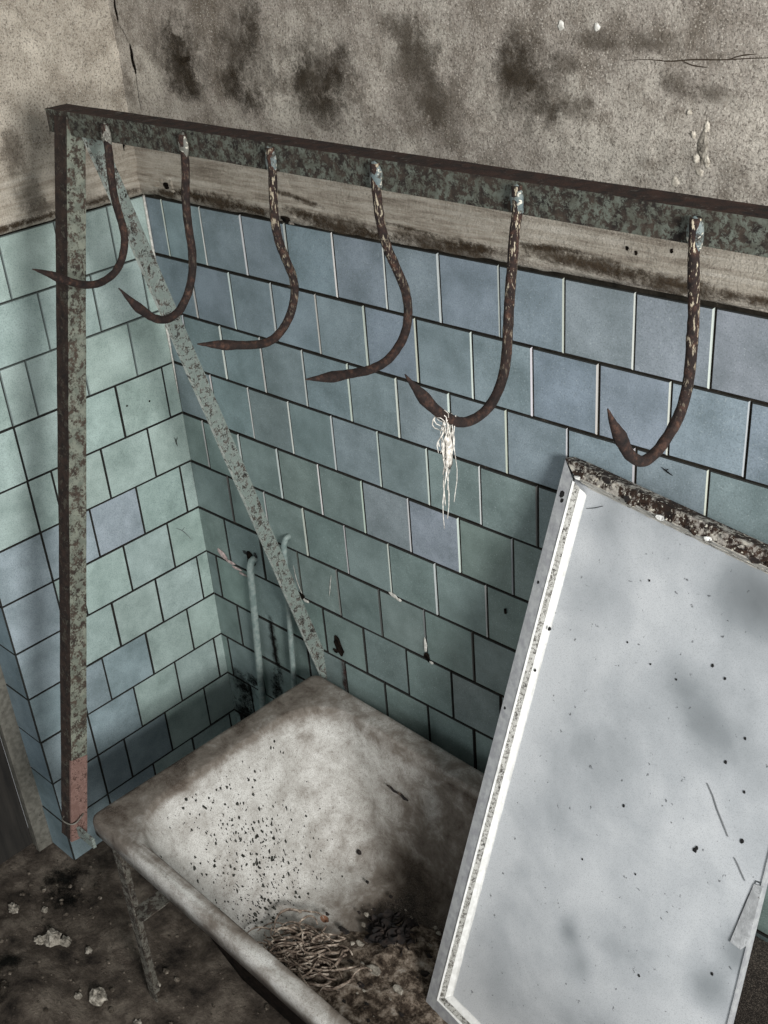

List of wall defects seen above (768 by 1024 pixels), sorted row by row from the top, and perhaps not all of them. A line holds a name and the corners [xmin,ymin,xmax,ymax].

crack [114,0,141,107]
leakage [295,50,345,117]
leakage [501,47,555,120]
crack [625,54,764,68]